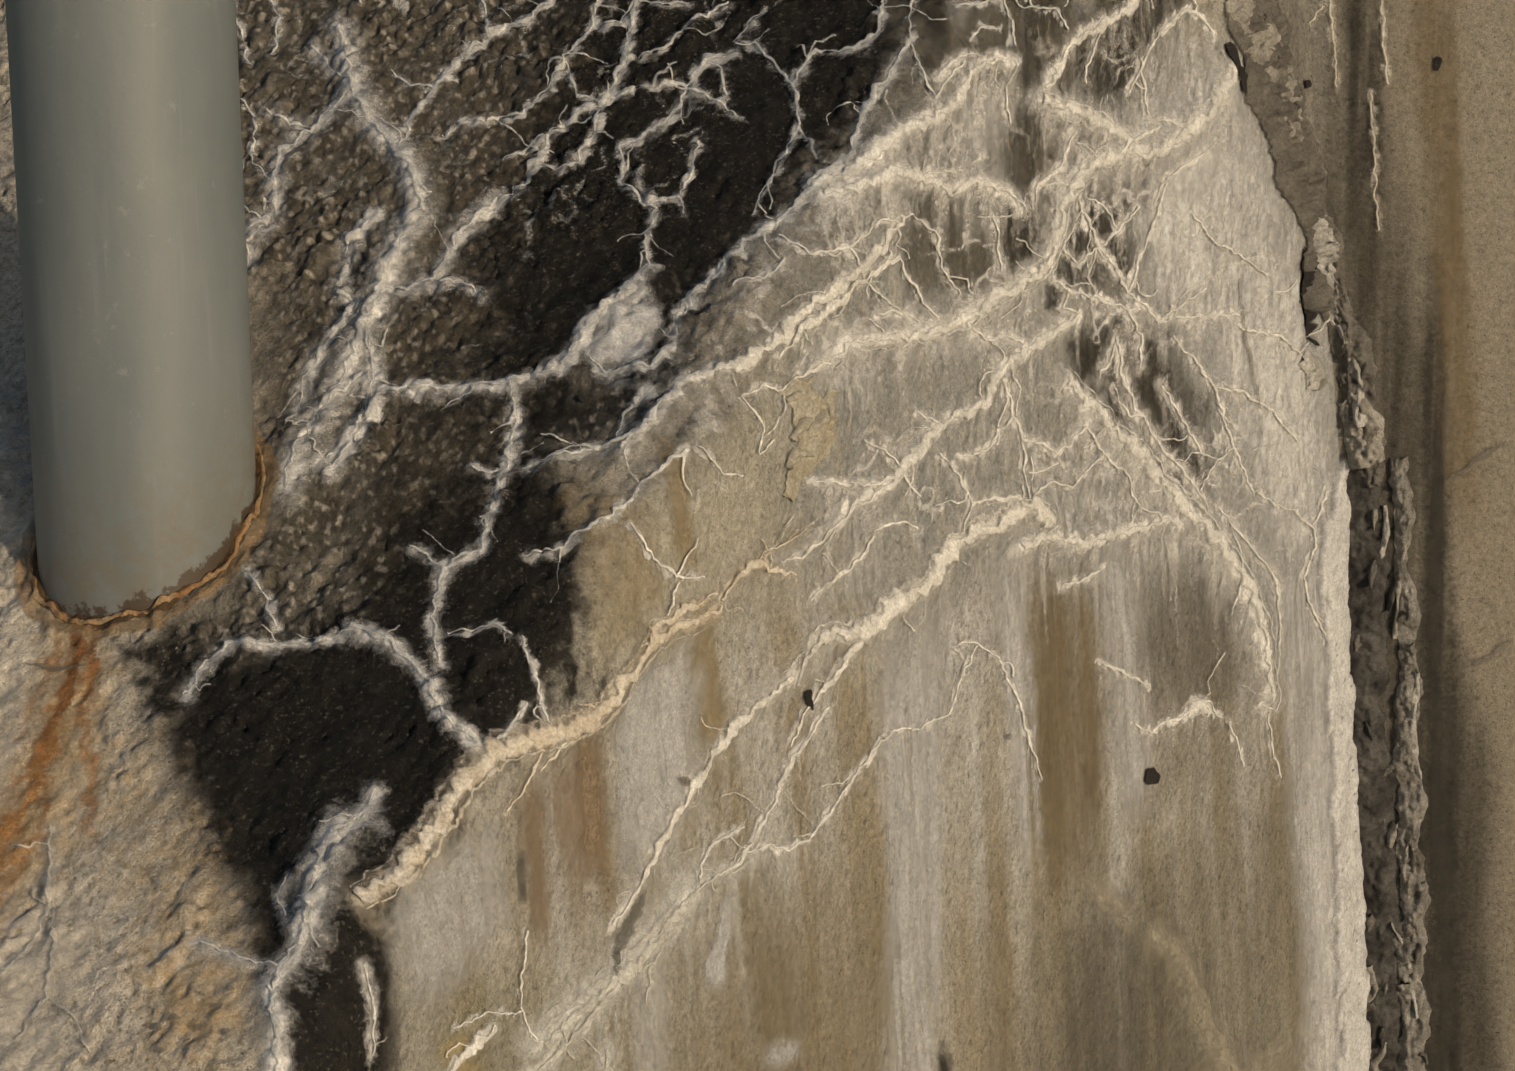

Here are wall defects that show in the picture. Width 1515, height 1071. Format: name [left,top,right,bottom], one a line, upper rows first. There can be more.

water stain [886,0,1145,342]
water stain [1129,40,1268,246]
crack [1225,42,1248,92]
water stain [1348,0,1382,307]
water stain [1052,324,1245,585]
crack [1239,278,1262,409]
crack [1299,247,1320,346]
rust [0,624,99,861]
water stain [528,738,605,920]
water stain [928,647,940,953]
water stain [1384,316,1485,1071]
water stain [445,1042,468,1071]